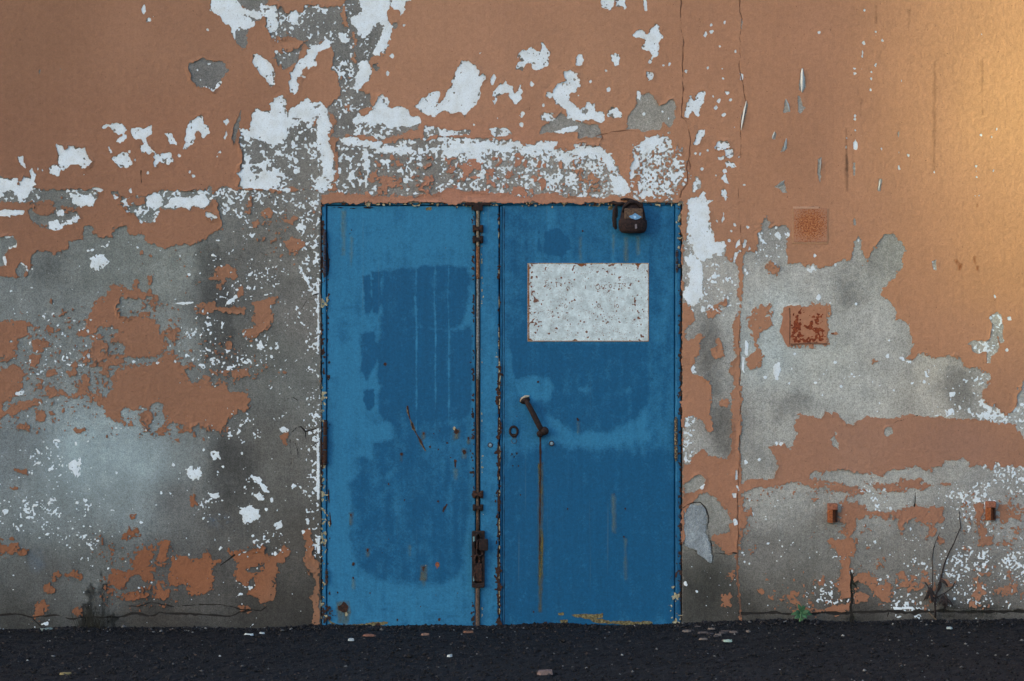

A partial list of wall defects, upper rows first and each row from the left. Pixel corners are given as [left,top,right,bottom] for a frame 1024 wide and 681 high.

peeling [684,91,732,118]
peeling [693,130,740,201]
peeling [0,0,692,629]
rust [790,308,835,345]
rust [423,350,475,497]
rust [538,437,554,592]
peeling [681,176,1024,632]
crack [683,330,1024,622]
crack [0,602,267,628]